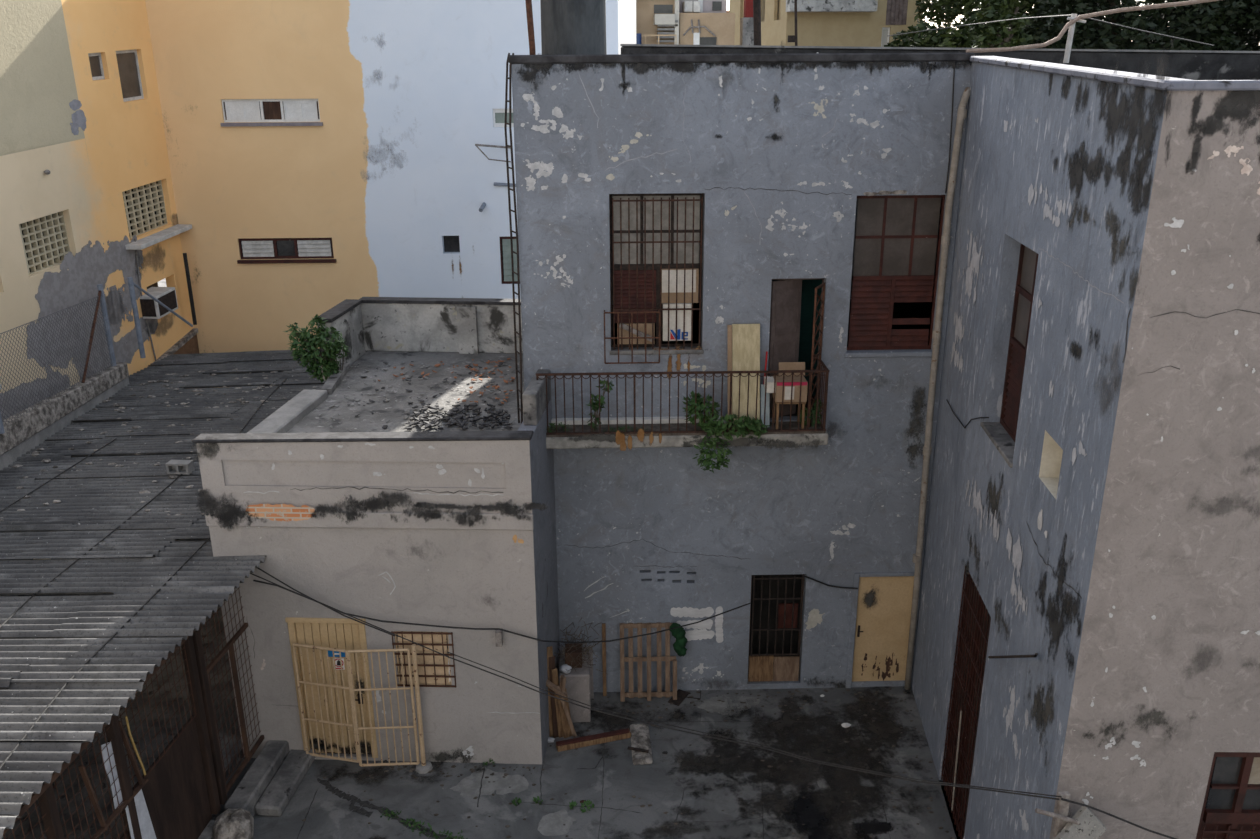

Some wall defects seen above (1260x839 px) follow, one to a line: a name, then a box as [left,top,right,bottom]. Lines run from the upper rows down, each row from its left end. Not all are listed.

peeling [521,94,582,140]
peeling [521,159,591,191]
peeling [606,132,652,180]
leakage [1049,40,1173,301]
leakage [1186,79,1260,173]
crack [1041,249,1260,375]
spalling [246,504,317,528]
leakage [311,491,546,527]
leakage [1035,533,1081,672]
leakage [576,701,652,754]
leakage [643,678,927,839]
leakage [1028,683,1054,764]